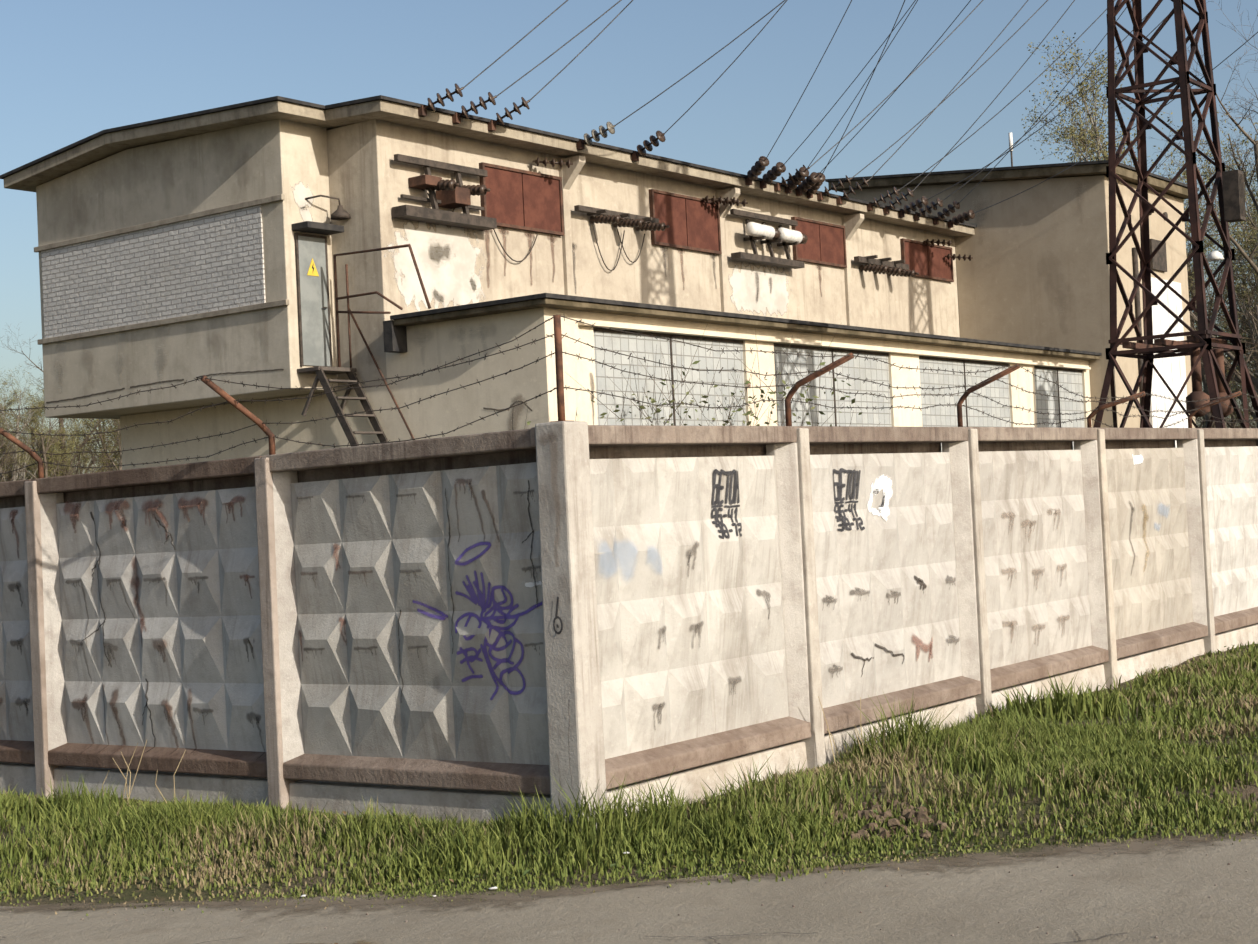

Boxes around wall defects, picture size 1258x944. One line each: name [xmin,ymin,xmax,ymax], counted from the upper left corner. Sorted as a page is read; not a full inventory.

corrosion [106,500,168,539]
corrosion [454,479,499,540]
crack [82,512,110,666]
corrosion [133,559,167,662]
corrosion [913,636,933,661]
corrosion [72,685,125,753]
crack [142,679,155,753]
corrosion [161,700,178,753]